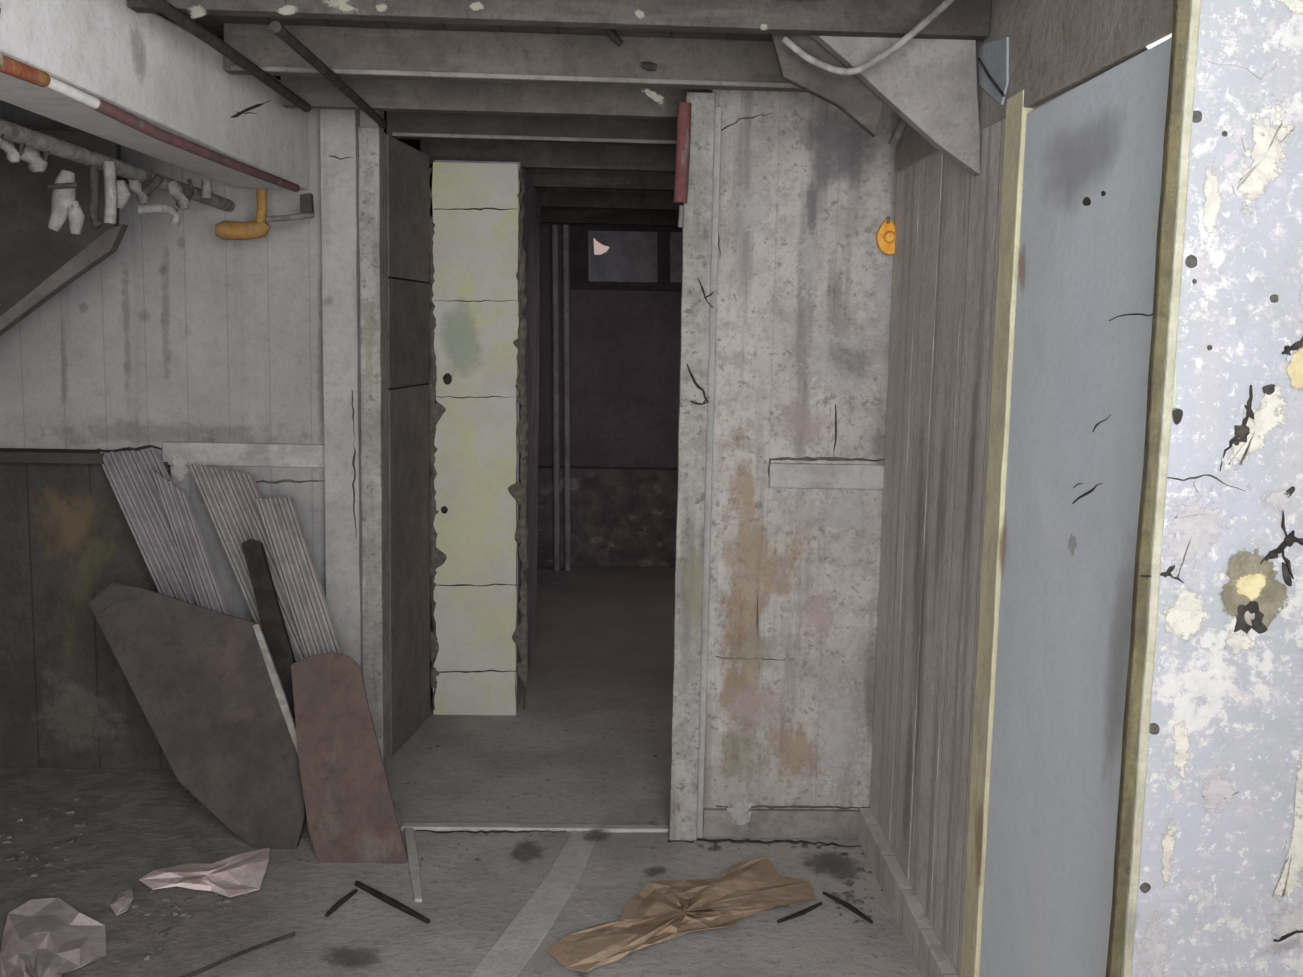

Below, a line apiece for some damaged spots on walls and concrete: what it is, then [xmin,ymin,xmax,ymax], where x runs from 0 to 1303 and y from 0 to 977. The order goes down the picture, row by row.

damp [807,192,815,228]
spalling [428,168,447,710]
spalling [508,169,529,709]
crack [687,364,709,405]
spalling [1172,408,1183,425]
peeling [1221,348,1303,468]
spalling [1161,480,1292,655]
peeling [1173,721,1190,779]
peeling [1160,818,1176,889]
peeling [1274,751,1303,903]